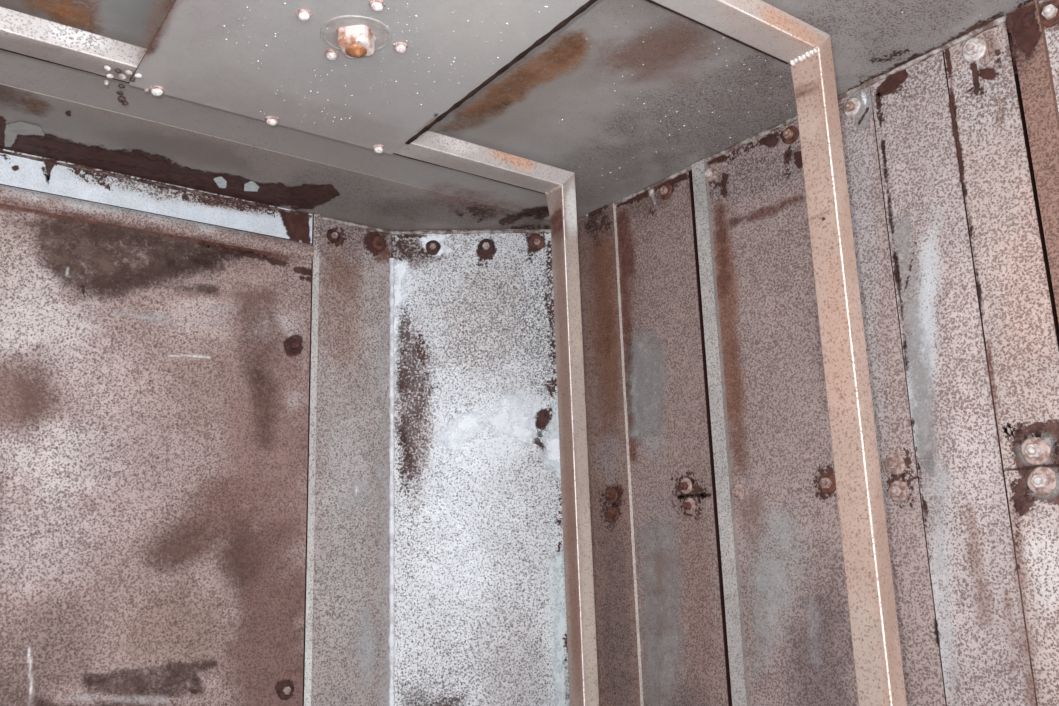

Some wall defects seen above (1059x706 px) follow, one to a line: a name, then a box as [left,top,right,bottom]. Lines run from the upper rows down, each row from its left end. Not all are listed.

rust [443,35,587,131]
peeling [0,116,340,244]
damp [81,244,217,297]
rust [358,228,432,261]
rust [452,192,562,267]
rust [813,464,836,500]
rust [1000,419,1059,578]
damp [85,661,216,706]